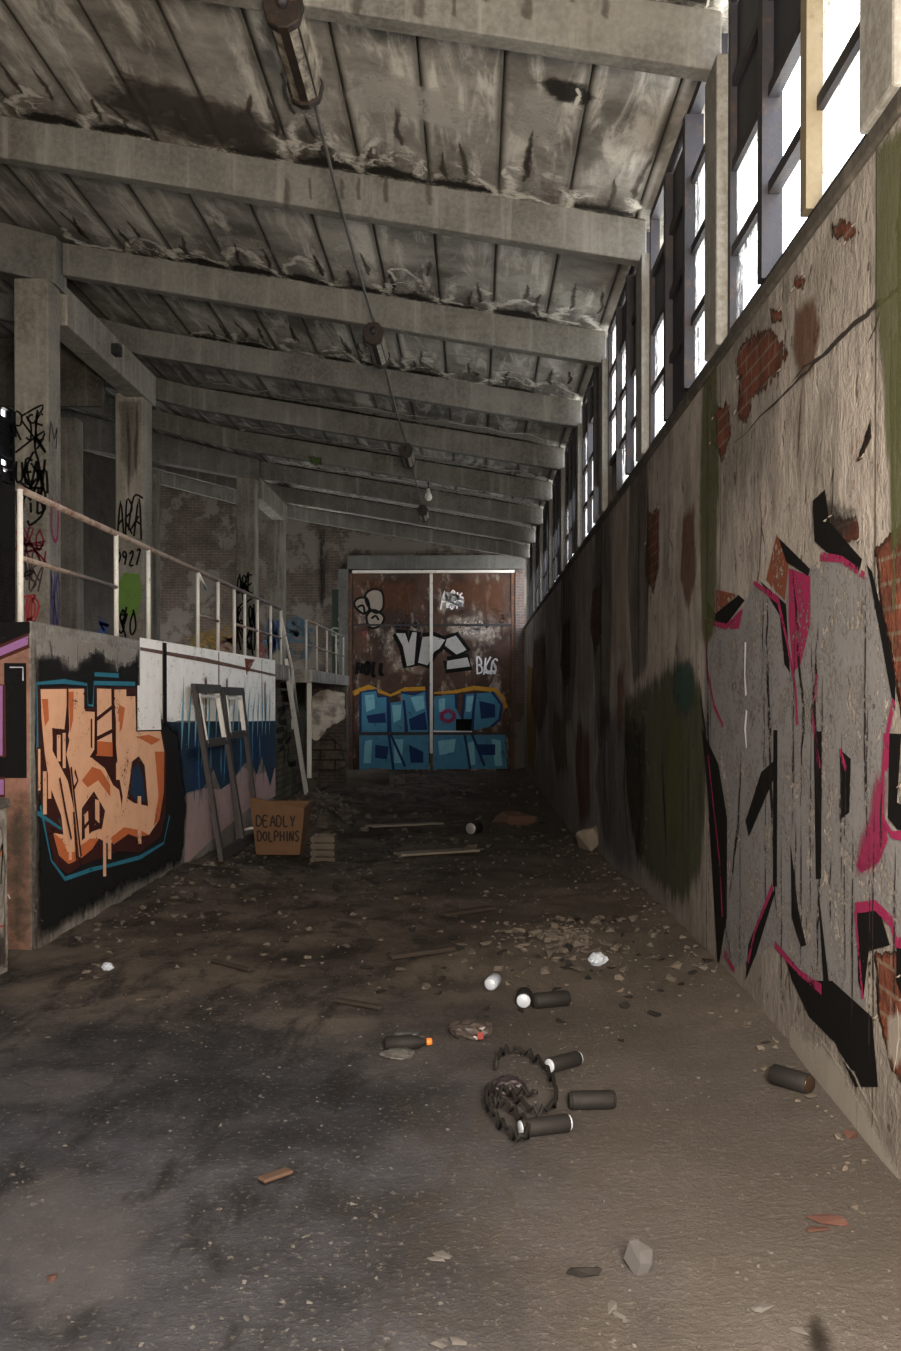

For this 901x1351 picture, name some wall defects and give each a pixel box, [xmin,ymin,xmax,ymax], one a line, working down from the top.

water stain [0,62,653,216]
spalling [823,515,861,543]
flaking render [874,532,901,715]
flaking render [872,951,901,1083]